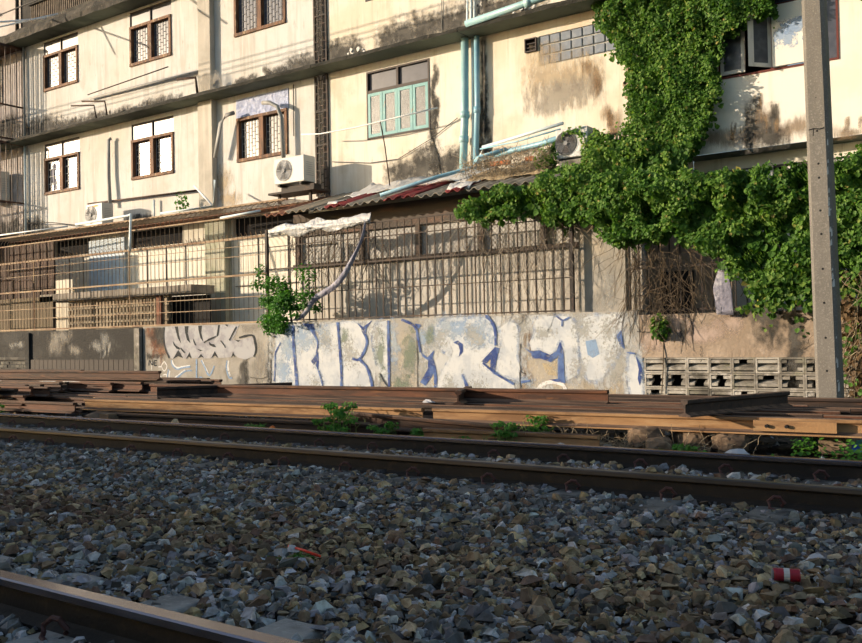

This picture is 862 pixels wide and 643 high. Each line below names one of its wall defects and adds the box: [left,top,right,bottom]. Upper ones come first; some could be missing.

damp [376,0,549,47]
damp [234,37,364,84]
mould [0,94,182,141]
damp [386,65,460,182]
damp [701,98,806,153]